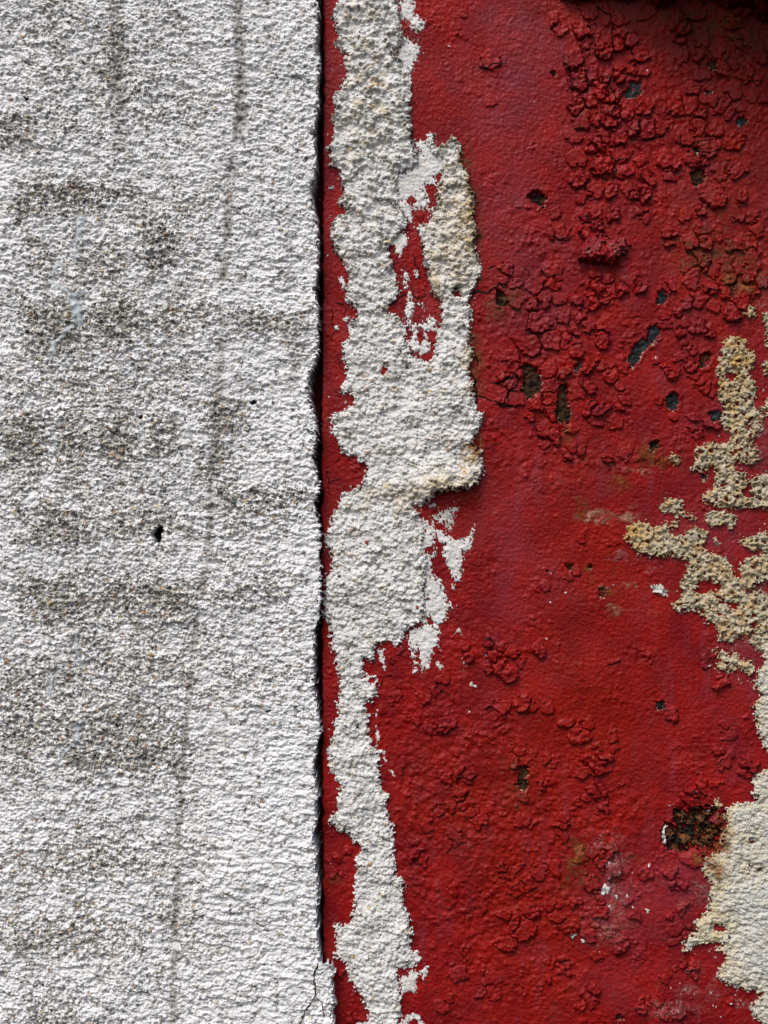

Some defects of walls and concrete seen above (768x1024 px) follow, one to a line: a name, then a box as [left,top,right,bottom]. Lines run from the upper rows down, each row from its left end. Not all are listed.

crack [550,6,724,240]
crack [470,265,609,413]
crack [706,284,742,323]
spalling [660,804,726,857]